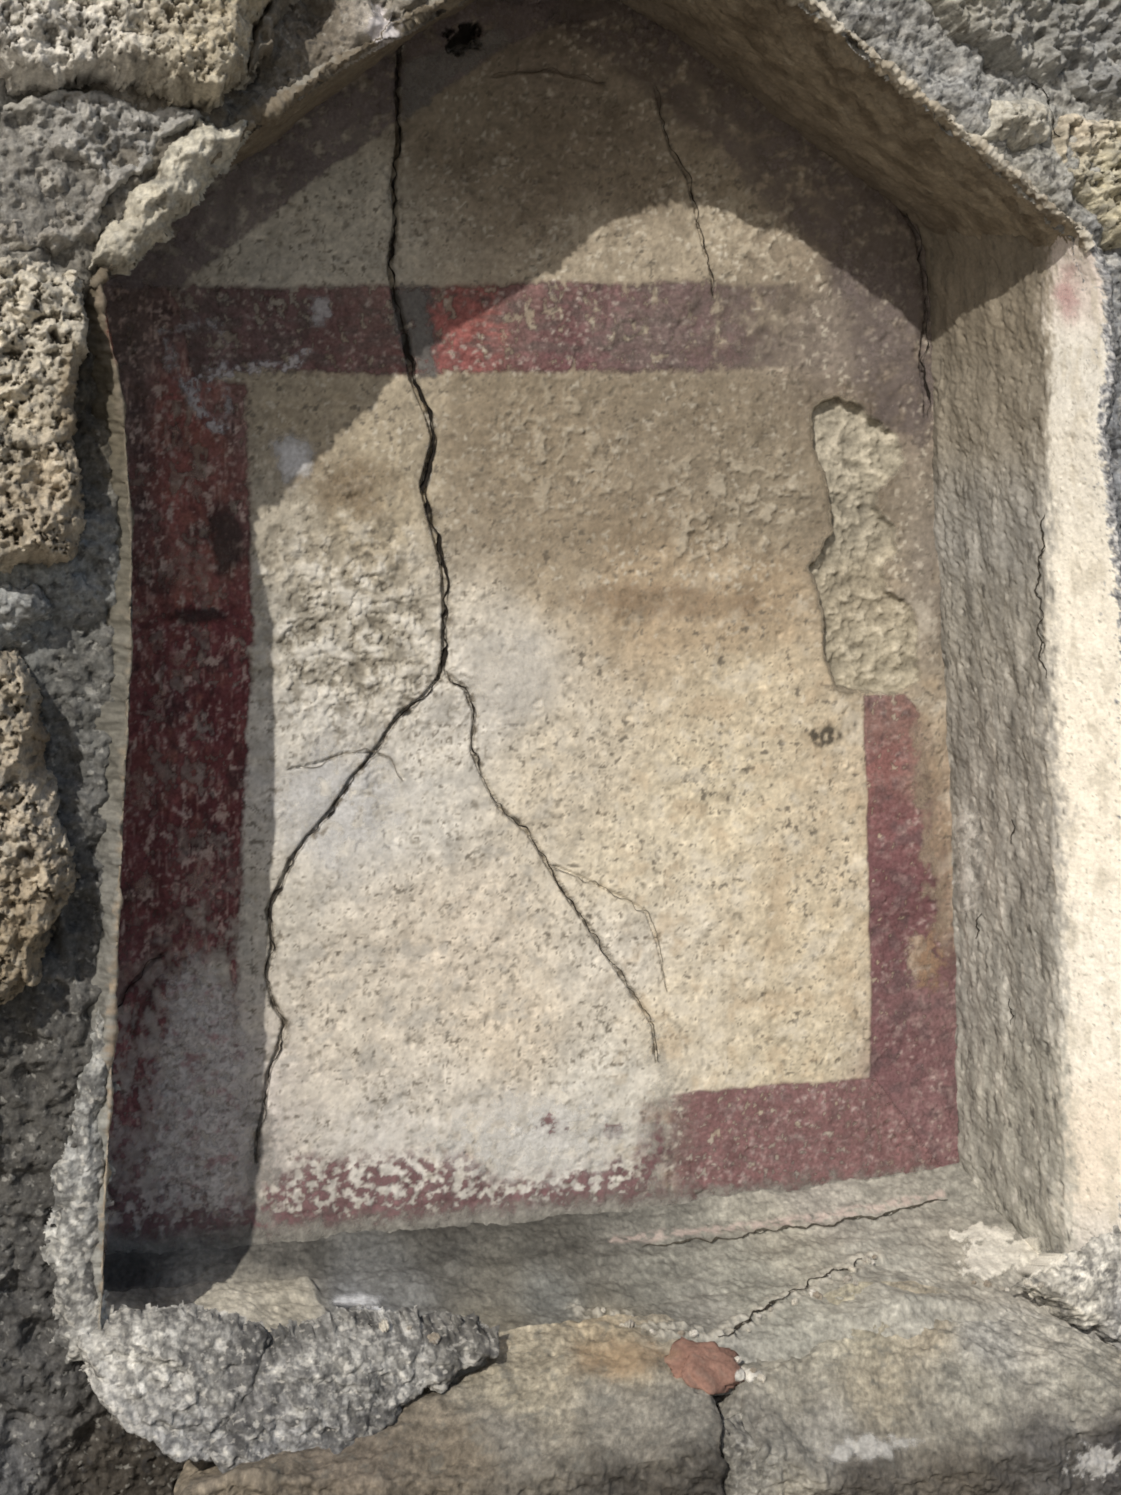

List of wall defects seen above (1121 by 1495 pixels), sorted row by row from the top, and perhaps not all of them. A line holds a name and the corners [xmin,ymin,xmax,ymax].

crack [656,87,714,296]
crack [252,45,667,1164]
flaking render [806,394,920,694]
crack [718,1258,862,1337]
crack [642,1199,948,1247]